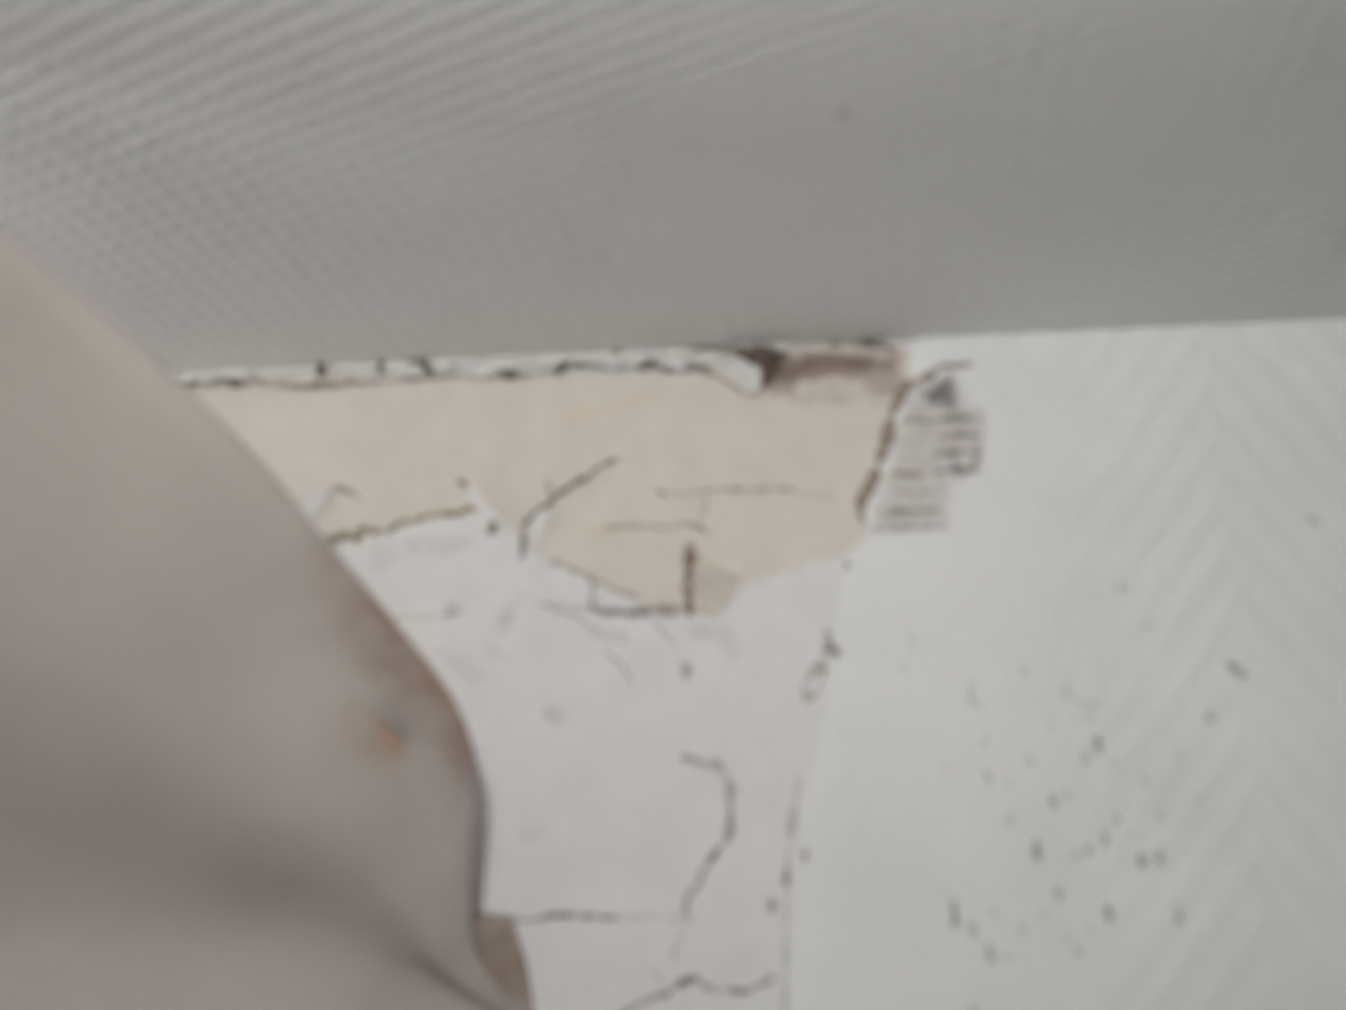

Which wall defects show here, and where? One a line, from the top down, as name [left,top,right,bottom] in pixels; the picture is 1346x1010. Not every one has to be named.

crack [184,377,261,387]
crack [328,359,458,386]
crack [499,345,760,386]
crack [329,458,617,557]
crack [608,546,741,615]
peeling [0,228,895,1010]
crack [506,912,616,921]
crack [629,975,771,1010]